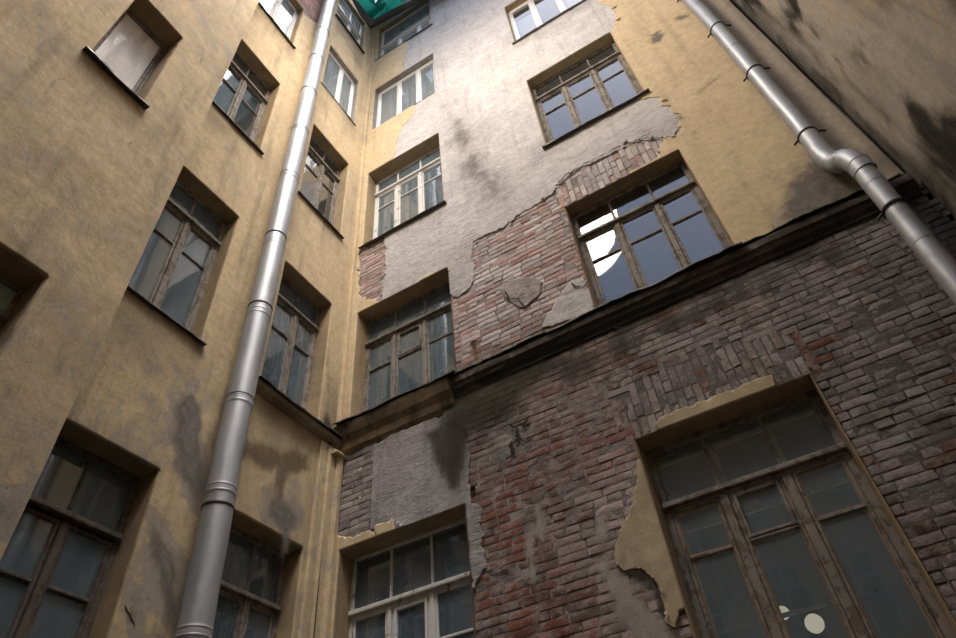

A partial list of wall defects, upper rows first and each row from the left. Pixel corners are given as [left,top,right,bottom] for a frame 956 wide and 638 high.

flaking render [298,0,323,24]
water stain [784,0,800,34]
water stain [906,102,956,175]
peeling [359,0,682,371]
water stain [785,163,852,218]
flaking render [909,183,956,260]
flaking render [337,214,956,638]